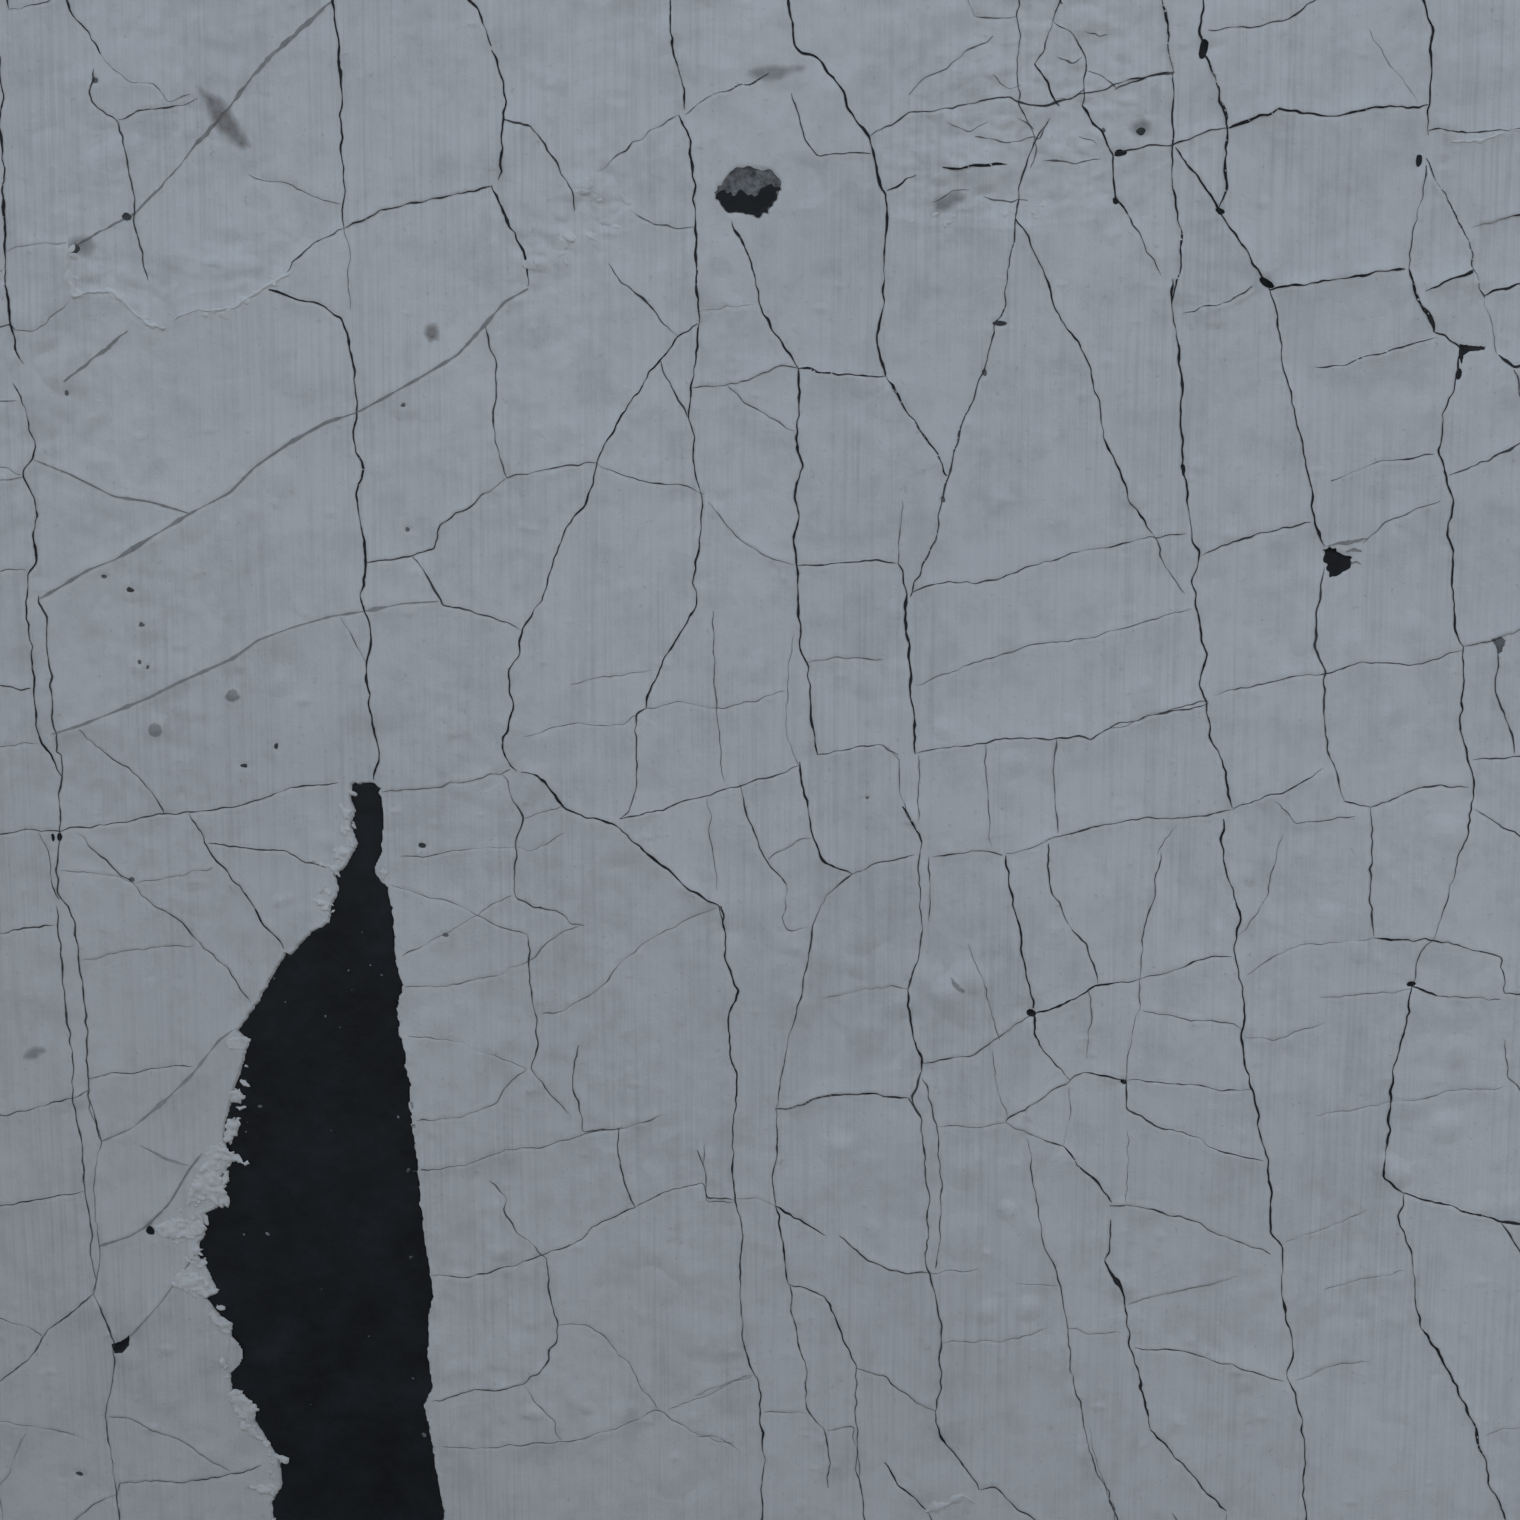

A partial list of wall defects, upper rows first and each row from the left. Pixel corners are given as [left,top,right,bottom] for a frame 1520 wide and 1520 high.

spalling [714,166,781,218]
crack [524,0,1520,1520]
spalling [1322,538,1368,577]
peeling [152,783,445,1520]